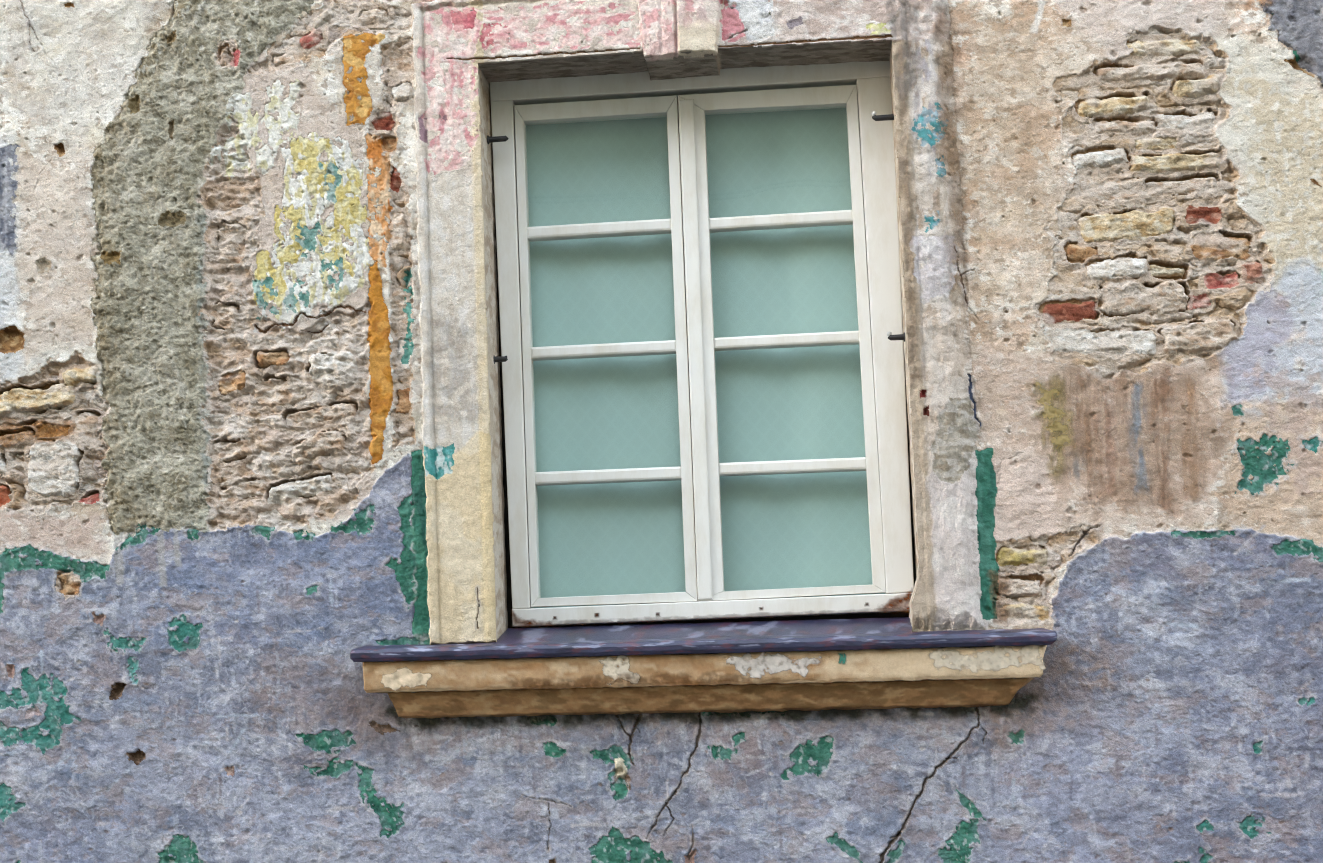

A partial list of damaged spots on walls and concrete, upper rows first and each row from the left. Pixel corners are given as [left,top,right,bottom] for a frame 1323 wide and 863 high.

spalling [1034,25,1276,384]
spalling [154,0,746,646]
spalling [0,351,111,516]
spalling [920,390,1101,626]
damp [1035,376,1091,477]
peeling [167,614,204,653]
crack [648,712,702,861]
crack [880,707,988,863]